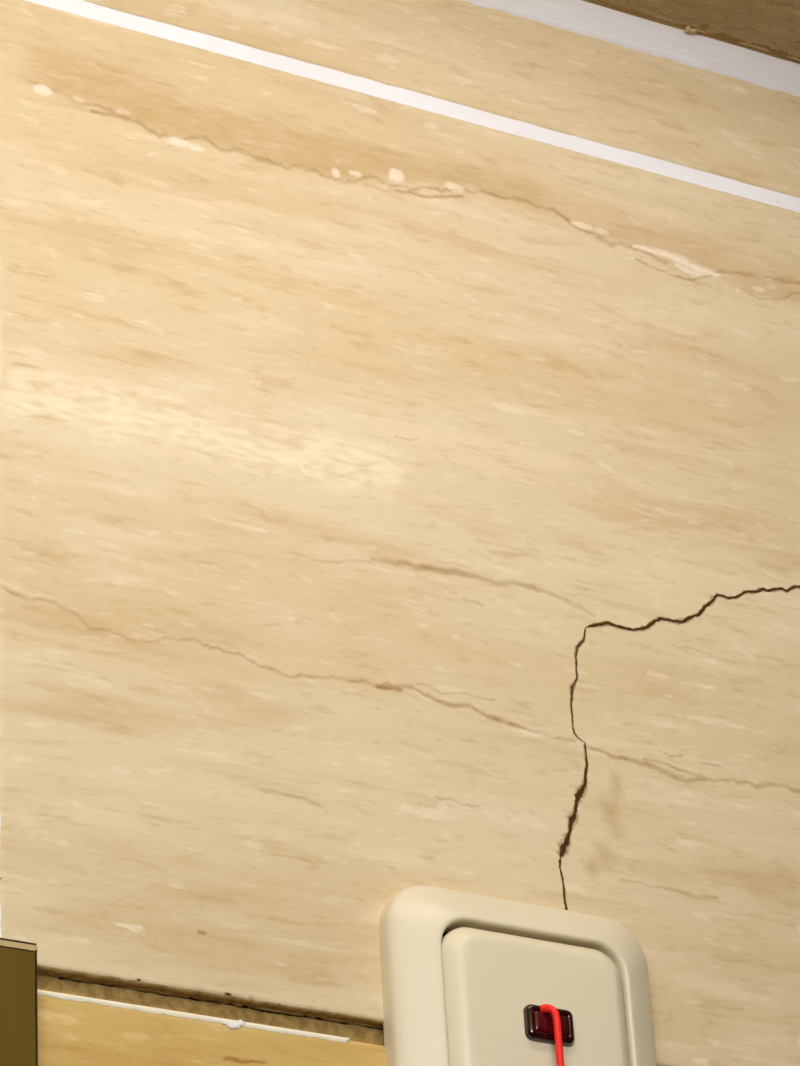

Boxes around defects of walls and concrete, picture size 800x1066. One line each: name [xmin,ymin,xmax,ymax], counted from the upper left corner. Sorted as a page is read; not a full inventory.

crack [558,585,800,910]